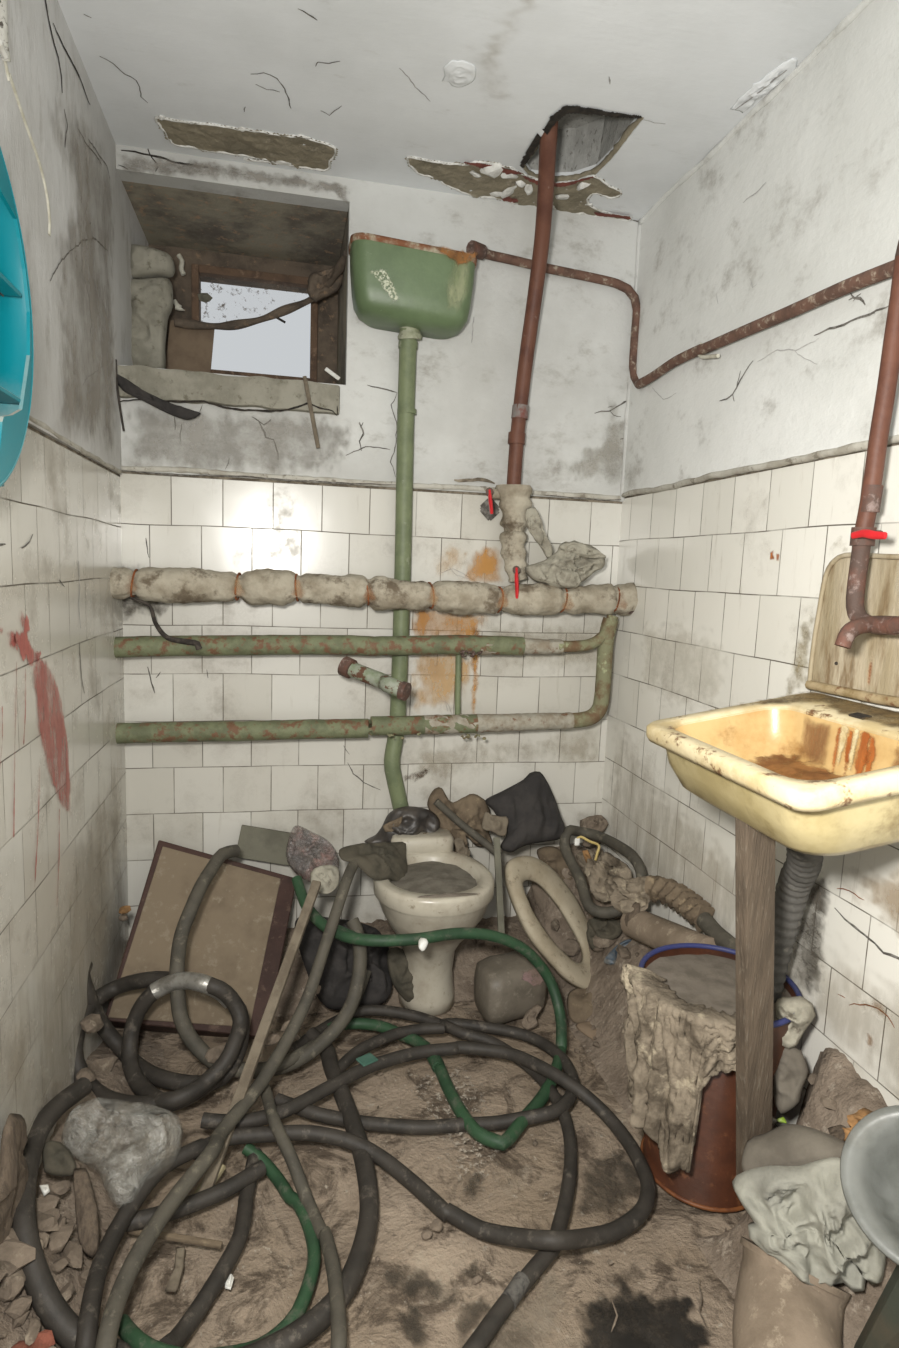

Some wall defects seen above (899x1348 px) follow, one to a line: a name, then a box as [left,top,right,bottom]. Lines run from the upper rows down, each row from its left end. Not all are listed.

flaking render [154,115,338,172]
flaking render [405,145,540,207]
spalling [553,113,635,221]
crack [720,293,888,401]
corrosion [468,549,497,578]
corrosion [387,611,574,740]